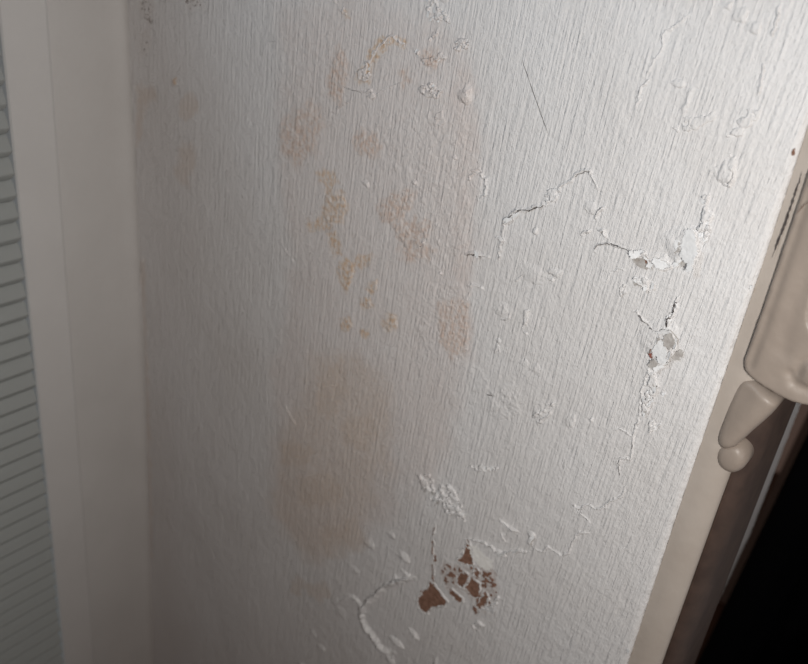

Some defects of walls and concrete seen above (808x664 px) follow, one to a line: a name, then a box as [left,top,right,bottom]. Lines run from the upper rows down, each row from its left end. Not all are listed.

crack [494,168,593,262]
crack [594,242,630,253]
peeling [629,194,714,292]
water stain [259,0,513,608]
crack [633,295,680,331]
peeling [636,317,683,372]
spalling [417,473,466,522]
crack [532,367,651,557]
peeling [331,568,417,664]
spalling [416,518,536,629]